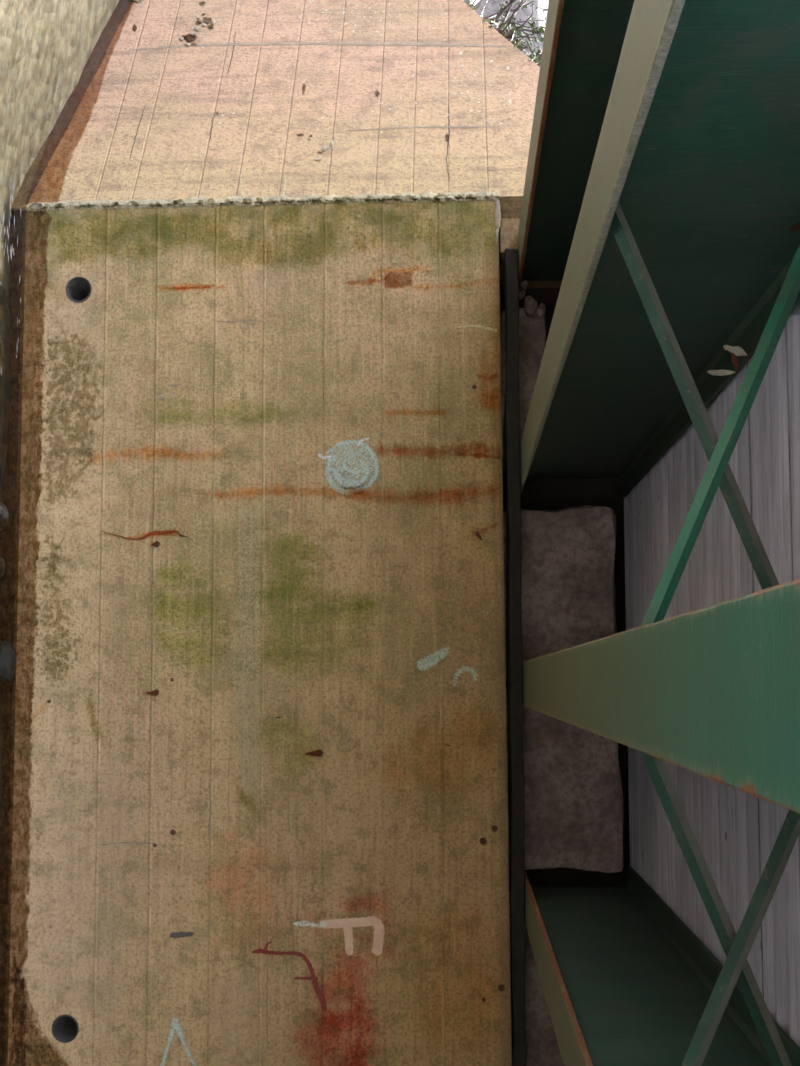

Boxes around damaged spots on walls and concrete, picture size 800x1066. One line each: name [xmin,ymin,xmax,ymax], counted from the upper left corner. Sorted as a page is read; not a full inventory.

damp [0,0,133,1066]